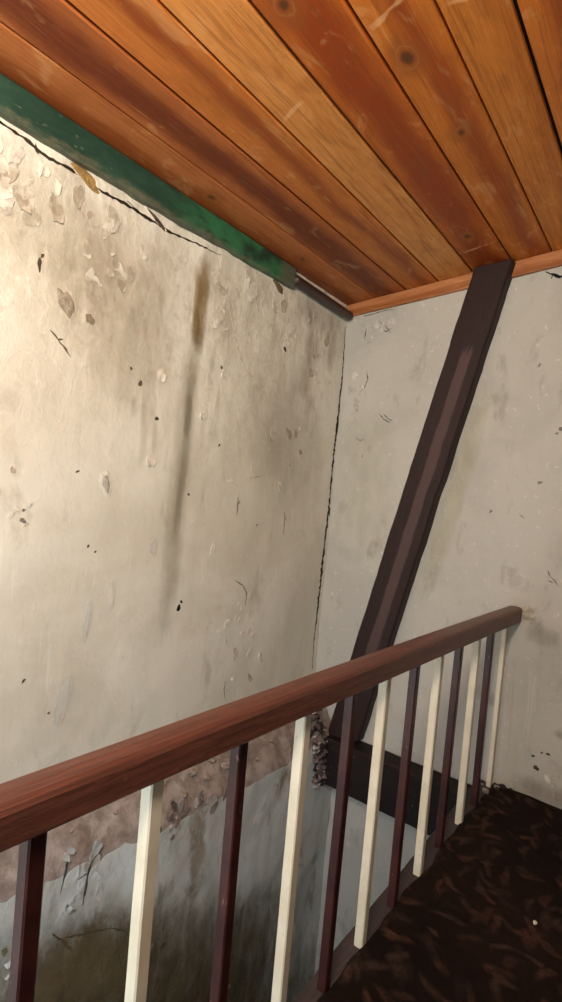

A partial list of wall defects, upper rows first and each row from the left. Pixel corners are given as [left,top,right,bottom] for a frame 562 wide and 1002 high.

crack [0,121,220,255]
water stain [193,269,208,344]
flaking render [310,709,328,789]
flaking render [160,784,227,841]
peeling [56,841,103,924]
water stain [34,925,130,1002]
water stain [146,916,216,1002]
water stain [227,907,272,1002]